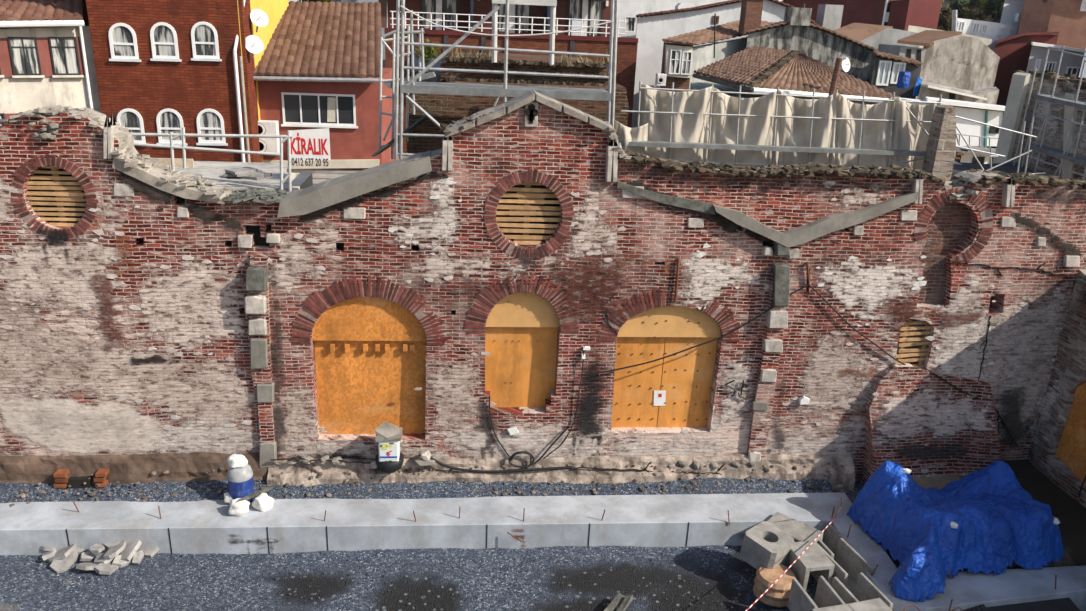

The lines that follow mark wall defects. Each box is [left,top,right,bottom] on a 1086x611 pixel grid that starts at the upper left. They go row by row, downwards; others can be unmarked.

peeling [0,172,259,454]
peeling [268,233,326,293]
peeling [273,386,327,452]
peeling [299,171,530,286]
spalling [543,188,631,327]
peeling [677,243,770,310]
peeling [816,255,927,330]
peeling [782,274,1072,460]